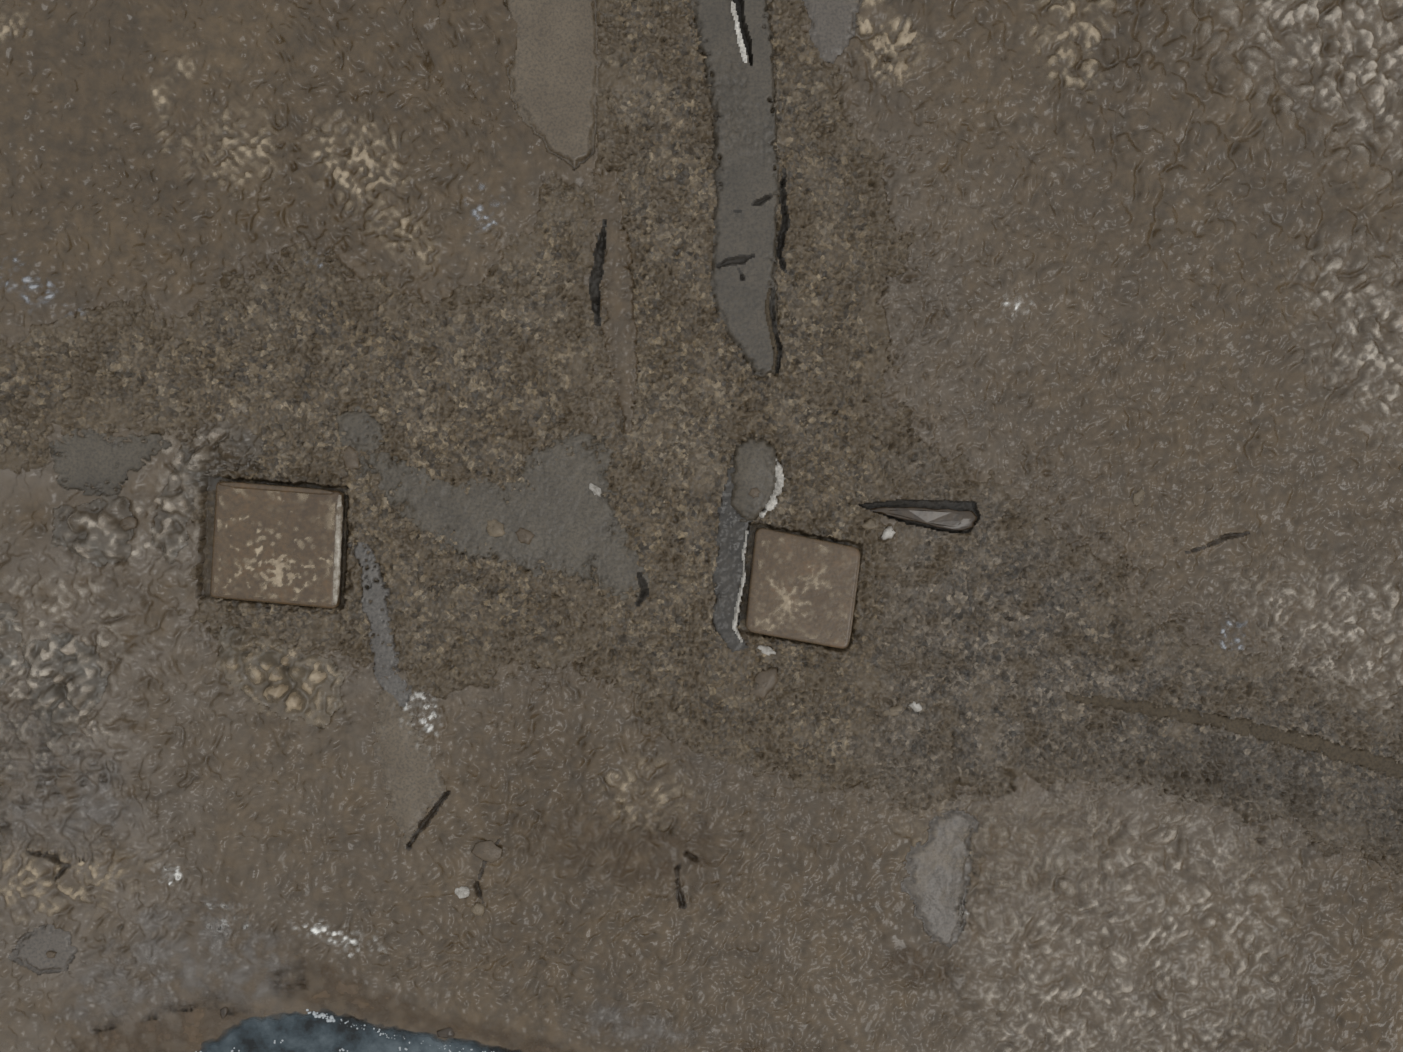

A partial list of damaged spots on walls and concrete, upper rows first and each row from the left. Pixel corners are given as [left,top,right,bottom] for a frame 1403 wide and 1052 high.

crack [731,0,753,66]
crack [715,168,791,373]
spalling [0,0,916,793]
spalling [846,423,1403,875]
peeling [901,808,979,948]